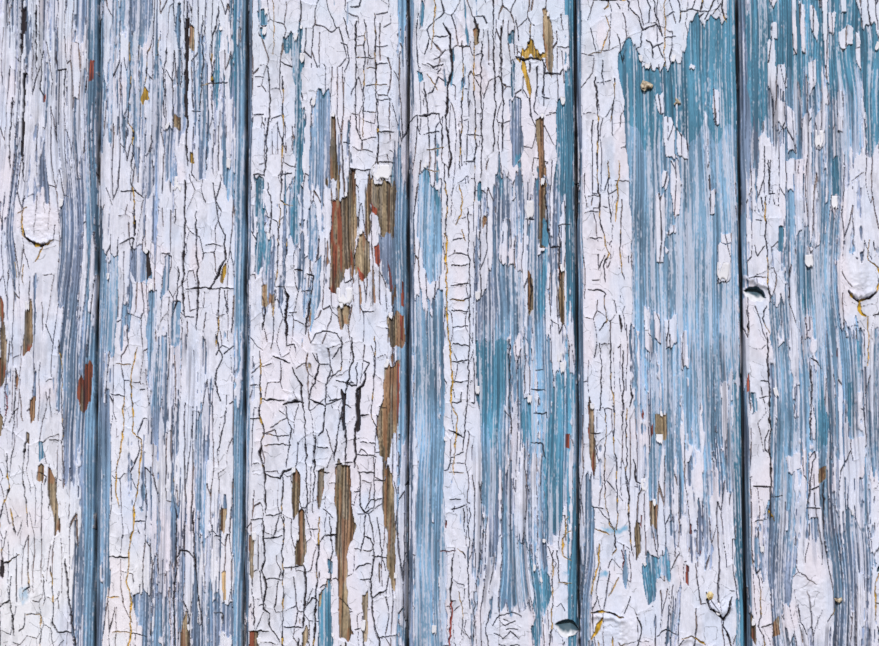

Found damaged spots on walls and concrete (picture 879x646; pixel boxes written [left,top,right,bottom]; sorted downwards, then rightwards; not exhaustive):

crack [0,0,87,300]
crack [0,314,97,646]
crack [51,0,236,646]
peeling [253,176,272,277]
peeling [318,459,368,646]
peeling [377,295,447,646]
peeling [475,95,572,453]
peeling [518,352,567,646]
crack [232,0,879,646]
peeling [642,547,671,605]
peeling [618,0,772,387]
peeling [856,22,879,158]